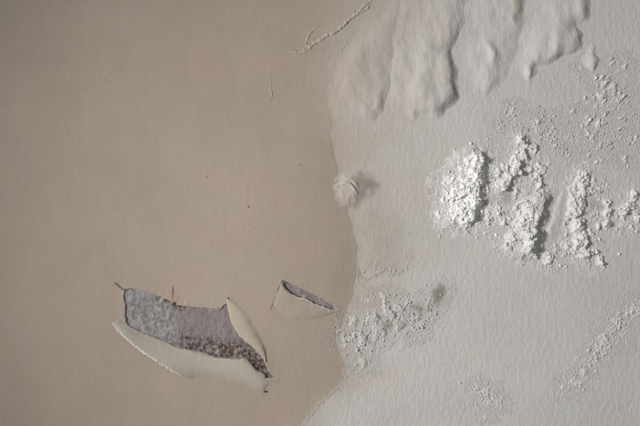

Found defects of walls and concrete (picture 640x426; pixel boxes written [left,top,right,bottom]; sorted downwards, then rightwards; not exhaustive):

crack [287,0,372,56]
peeling [112,279,282,393]
spalling [271,270,458,378]